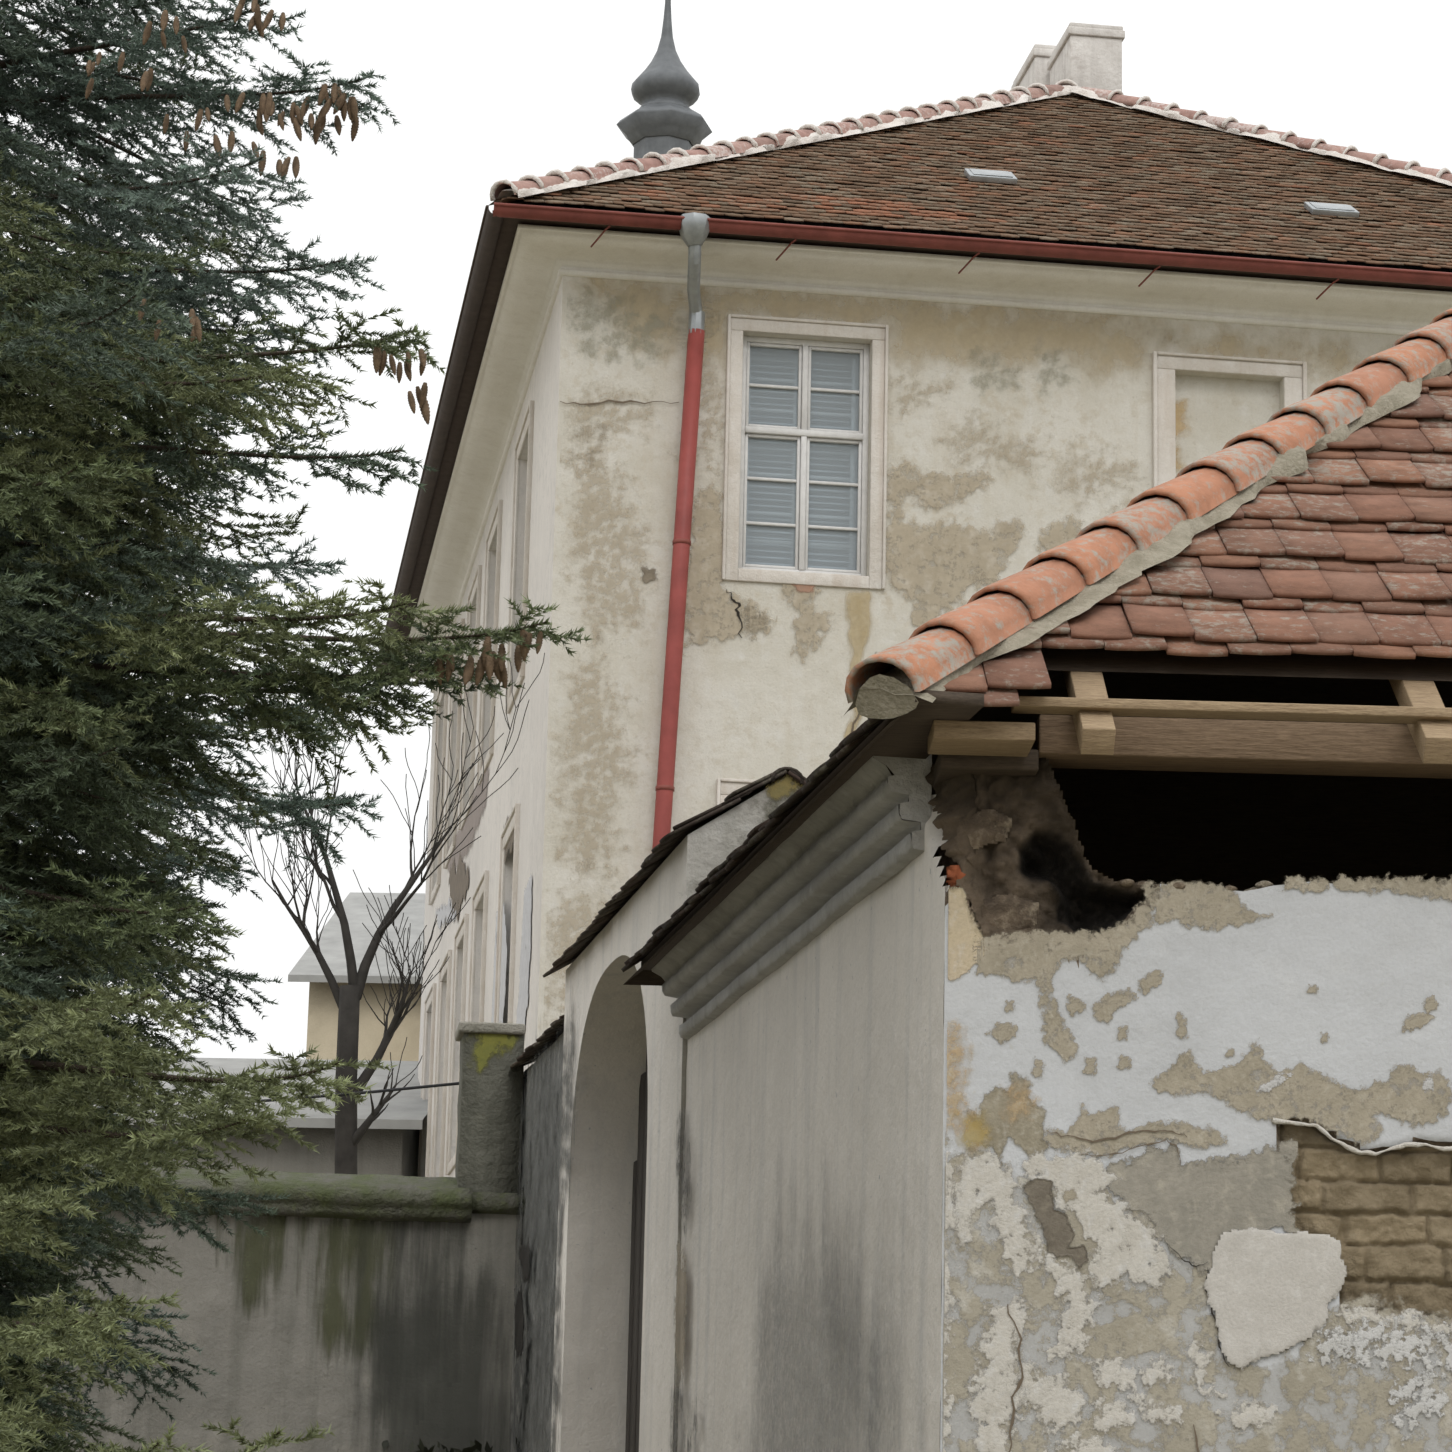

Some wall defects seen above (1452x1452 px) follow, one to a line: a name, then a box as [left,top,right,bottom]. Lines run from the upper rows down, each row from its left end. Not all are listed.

crack [560,398,679,406]
flaking render [886,429,1081,626]
damp [222,1215,286,1308]
damp [351,1007,575,1452]
damp [670,1114,697,1452]
crack [1007,1304,1024,1452]
peeling [942,874,1452,1452]